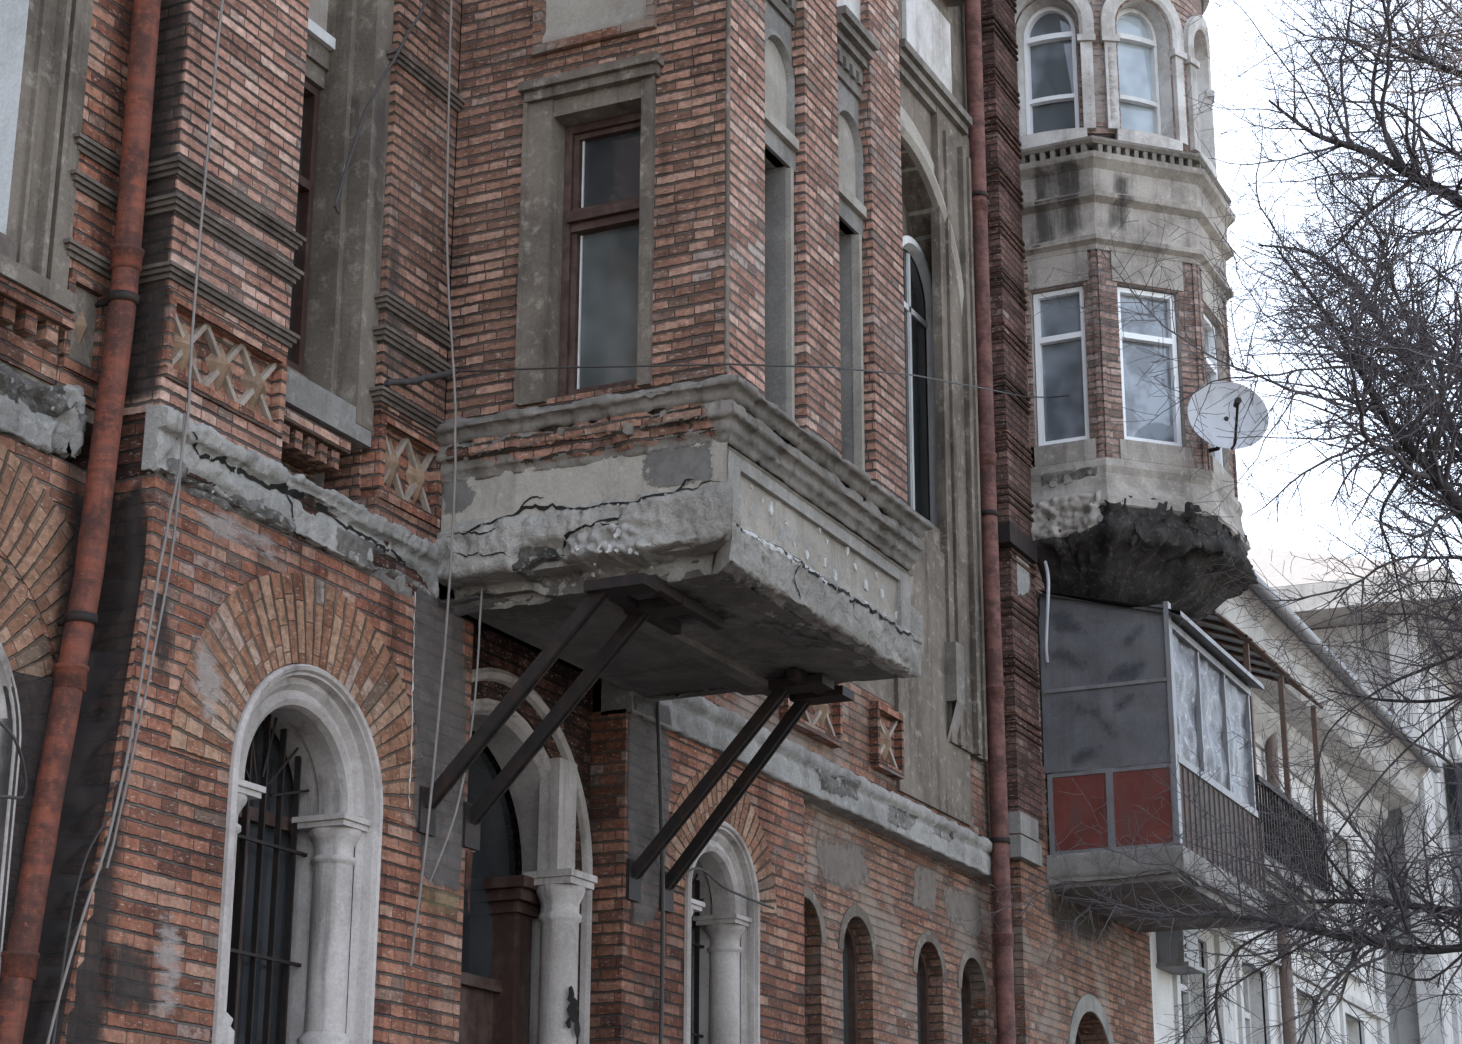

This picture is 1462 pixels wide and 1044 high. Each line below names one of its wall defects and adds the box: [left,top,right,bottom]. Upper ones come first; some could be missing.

spalling [0,363,89,458]
spalling [166,457,296,534]
spalling [336,526,412,599]
crack [448,478,721,558]
spalling [512,522,664,588]
peeling [743,484,910,632]
spalling [1031,466,1103,541]